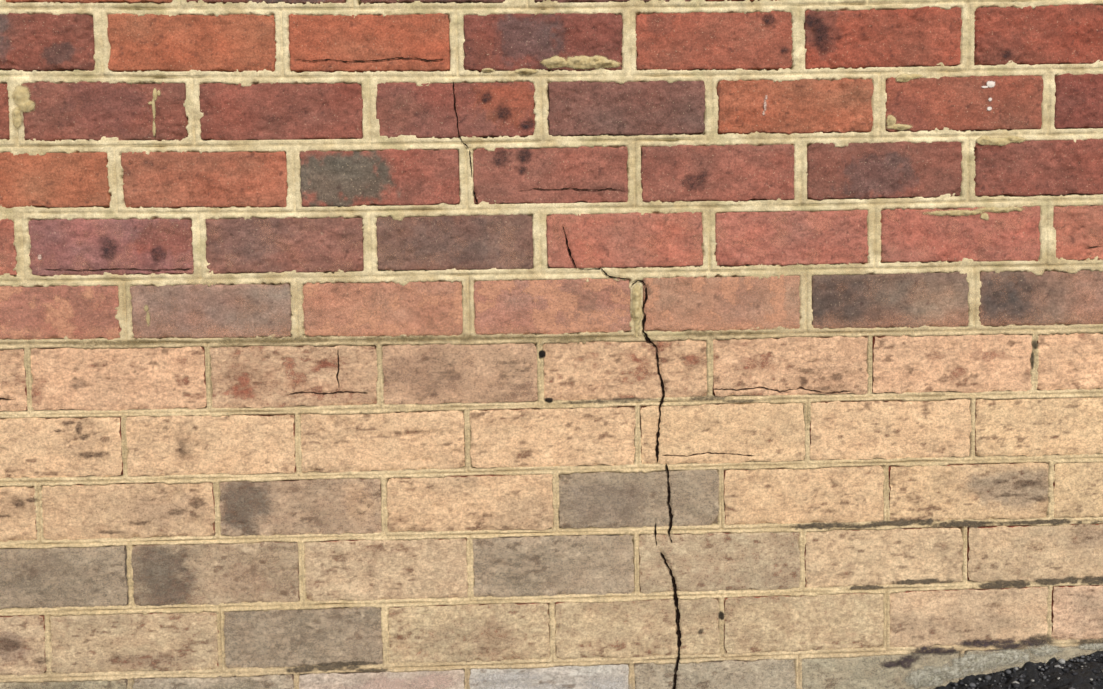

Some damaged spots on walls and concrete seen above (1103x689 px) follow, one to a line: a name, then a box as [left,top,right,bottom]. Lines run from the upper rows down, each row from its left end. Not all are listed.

crack [520,185,623,193]
crack [563,227,754,689]